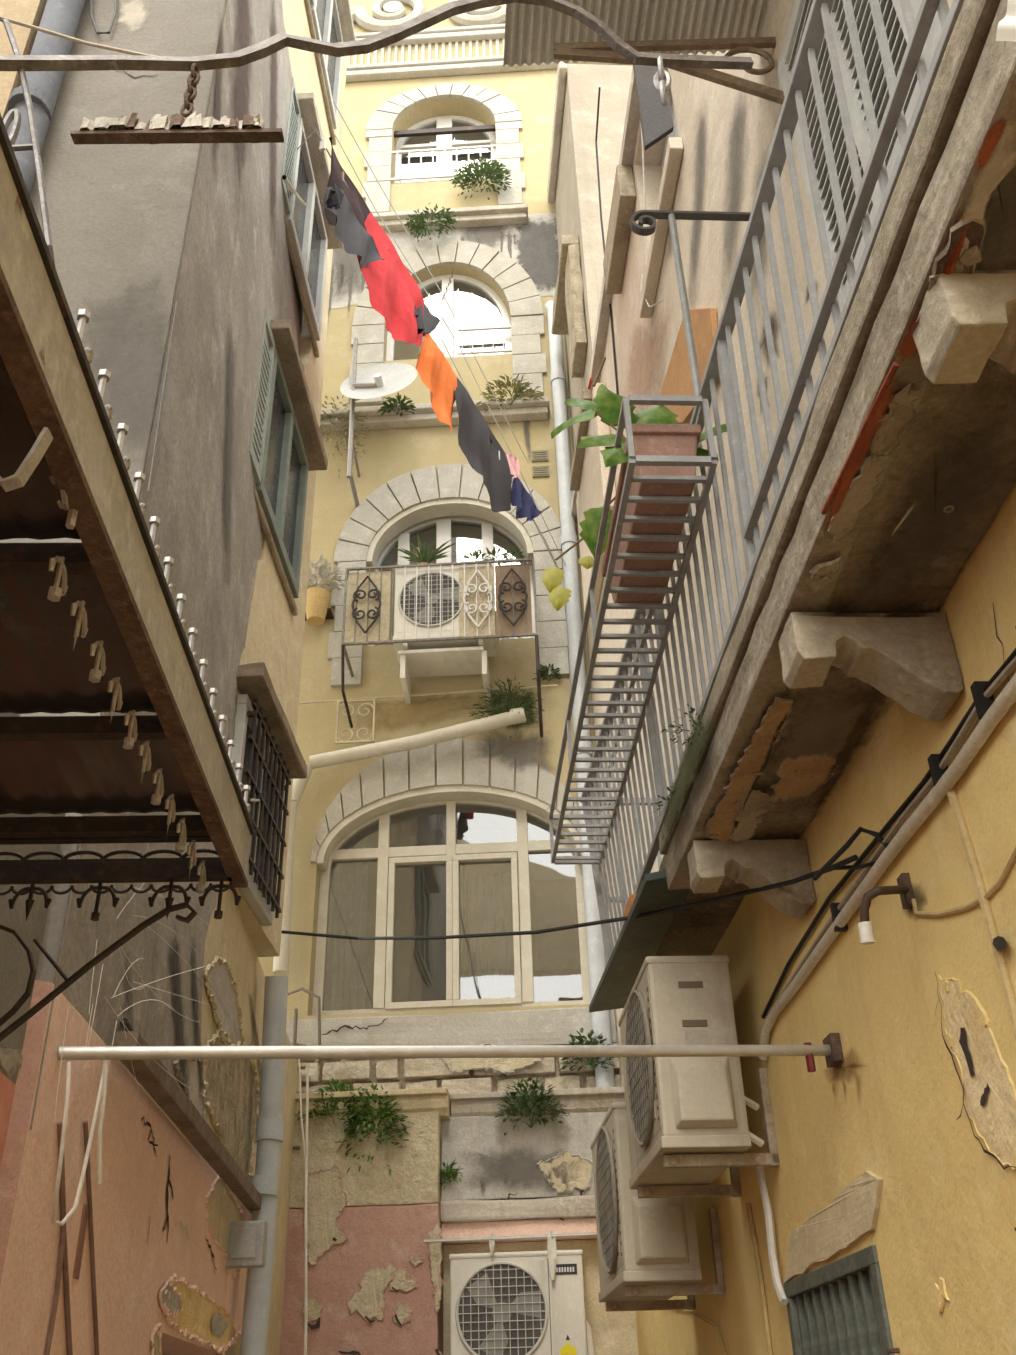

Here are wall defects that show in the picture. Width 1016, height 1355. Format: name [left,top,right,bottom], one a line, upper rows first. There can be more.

corrosion [821,317,920,529]
spalling [706,697,840,845]
peeling [938,975,1016,1172]
peeling [302,1165,348,1270]
water stain [481,1150,567,1191]
peeling [536,1150,593,1194]
peeling [150,1273,242,1355]
peeling [346,1221,444,1326]